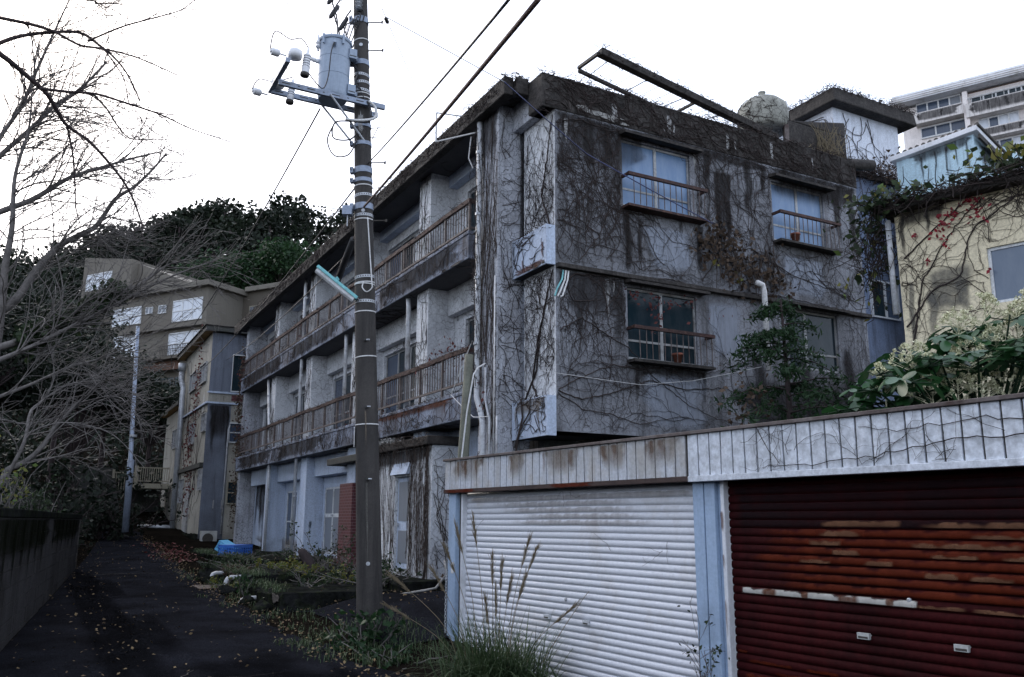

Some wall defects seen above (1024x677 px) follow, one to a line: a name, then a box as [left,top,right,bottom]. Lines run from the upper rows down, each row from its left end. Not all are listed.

damp [561,104,856,243]
damp [623,214,643,267]
damp [210,405,229,442]
peeling [801,521,898,566]
peeling [914,523,1024,562]
corrosion [760,529,1024,606]
peeling [743,587,964,612]